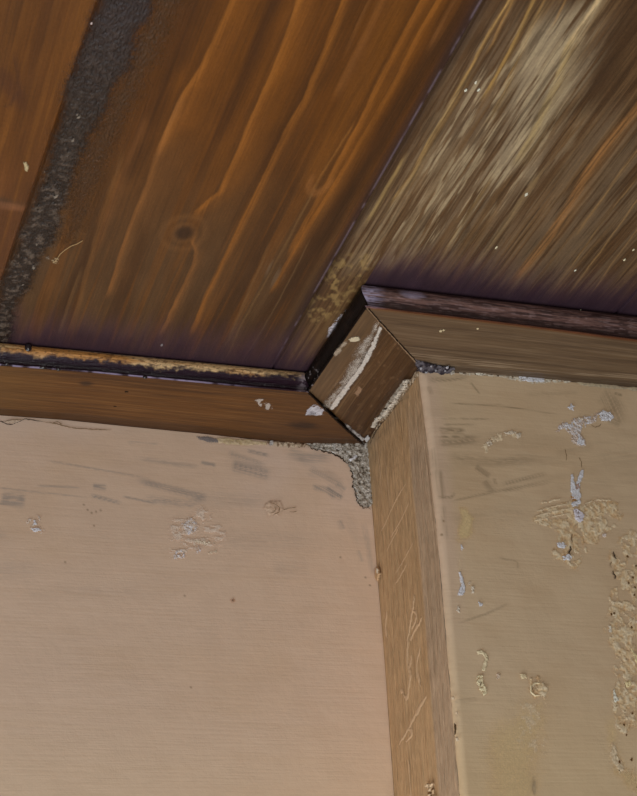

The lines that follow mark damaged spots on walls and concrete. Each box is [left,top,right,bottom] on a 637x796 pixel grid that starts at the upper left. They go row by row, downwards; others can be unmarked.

leakage [0,0,198,343]
peeling [571,483,585,522]